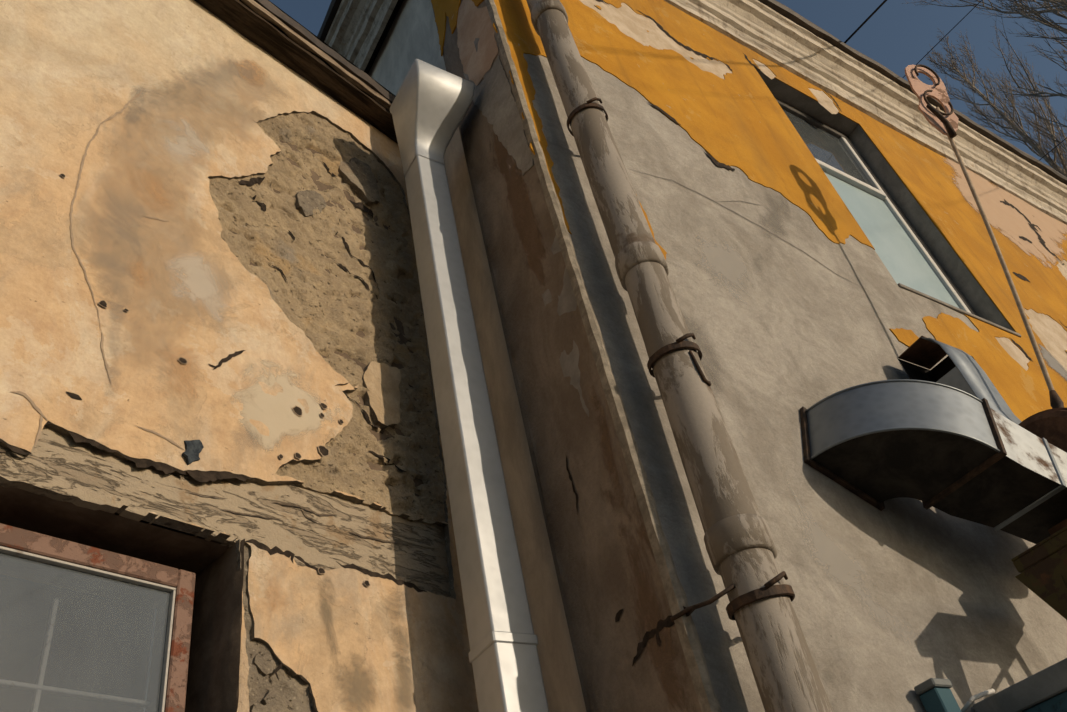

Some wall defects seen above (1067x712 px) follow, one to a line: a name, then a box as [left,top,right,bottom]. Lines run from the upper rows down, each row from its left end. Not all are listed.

peeling [579,0,732,80]
peeling [743,53,776,79]
peeling [809,88,842,114]
crack [70,88,144,385]
crack [630,169,859,286]
efflorescence [176,257,217,317]
crack [209,350,246,369]
flaking render [209,112,446,525]
peeling [995,337,1032,371]
peeling [1024,308,1067,372]
crack [566,456,578,513]
flaking render [235,539,313,712]